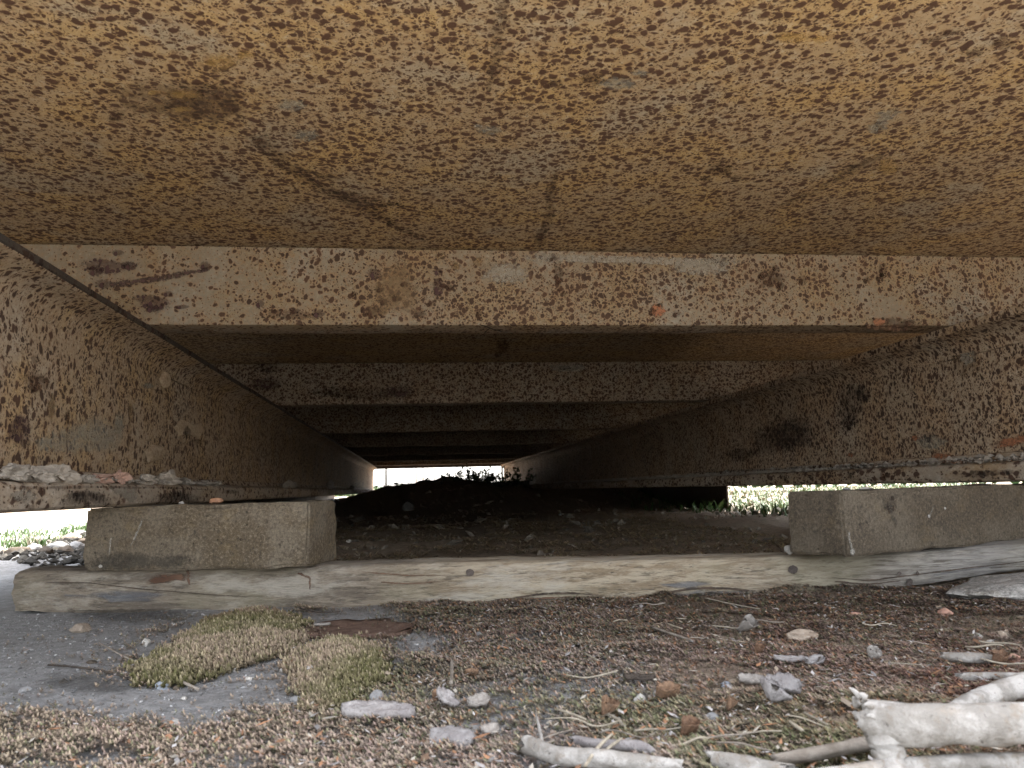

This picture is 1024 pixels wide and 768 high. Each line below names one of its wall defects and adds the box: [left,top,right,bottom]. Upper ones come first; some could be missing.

corrosion [72,251,130,276]